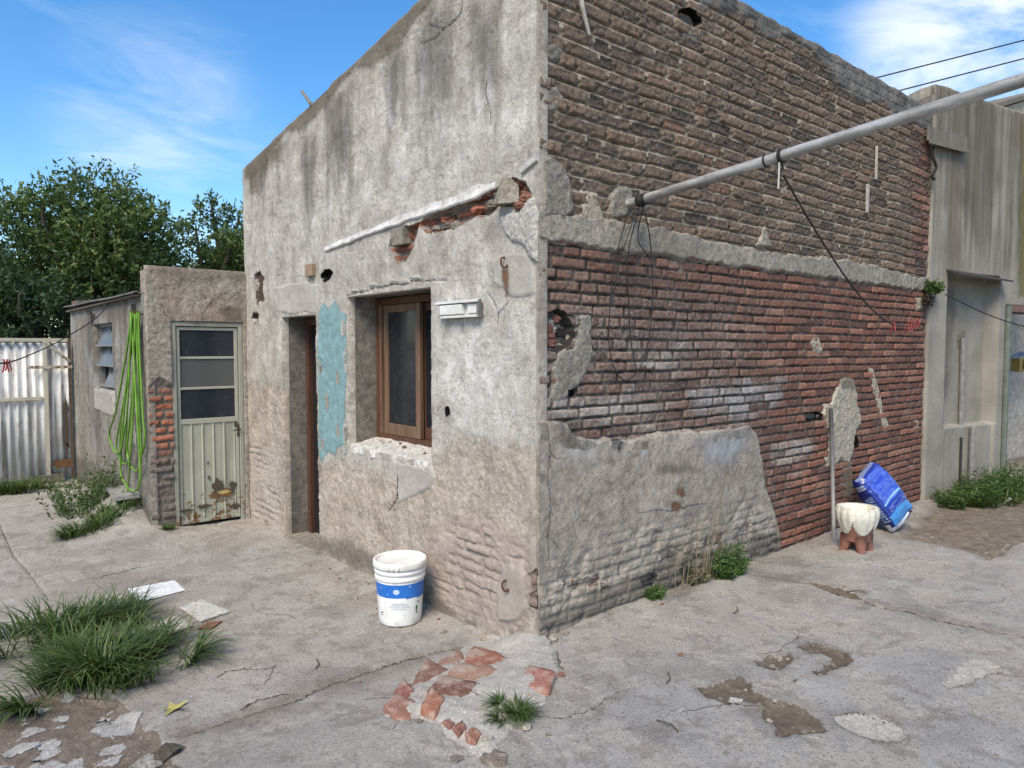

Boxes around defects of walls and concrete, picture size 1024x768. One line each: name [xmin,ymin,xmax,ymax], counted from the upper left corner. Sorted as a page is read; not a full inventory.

spalling [678,7,702,27]
leakage [245,0,429,191]
spalling [388,177,532,263]
spalling [251,270,265,323]
spalling [547,308,575,353]
spalling [522,568,538,609]